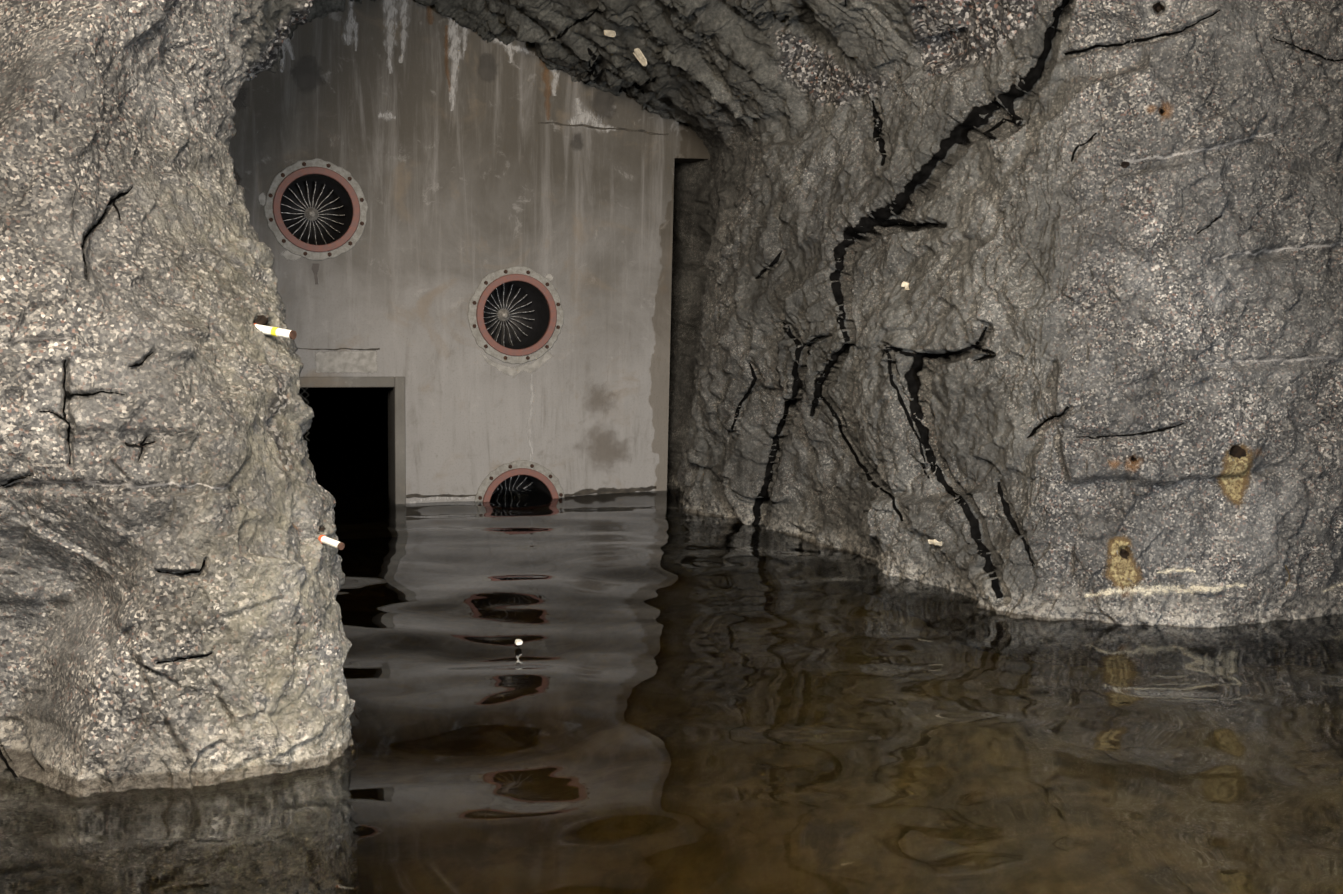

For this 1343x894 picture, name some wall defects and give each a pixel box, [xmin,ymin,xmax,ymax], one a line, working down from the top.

damp [343,0,358,51]
efflorescence [383,0,407,74]
damp [447,18,467,111]
damp [479,38,535,81]
crack [1273,36,1343,62]
damp [570,91,615,149]
crack [82,185,133,278]
crack [752,0,1221,525]
crack [727,362,757,431]
crack [884,326,1035,599]
corrosion [1217,445,1253,505]
corrosion [1105,537,1142,591]